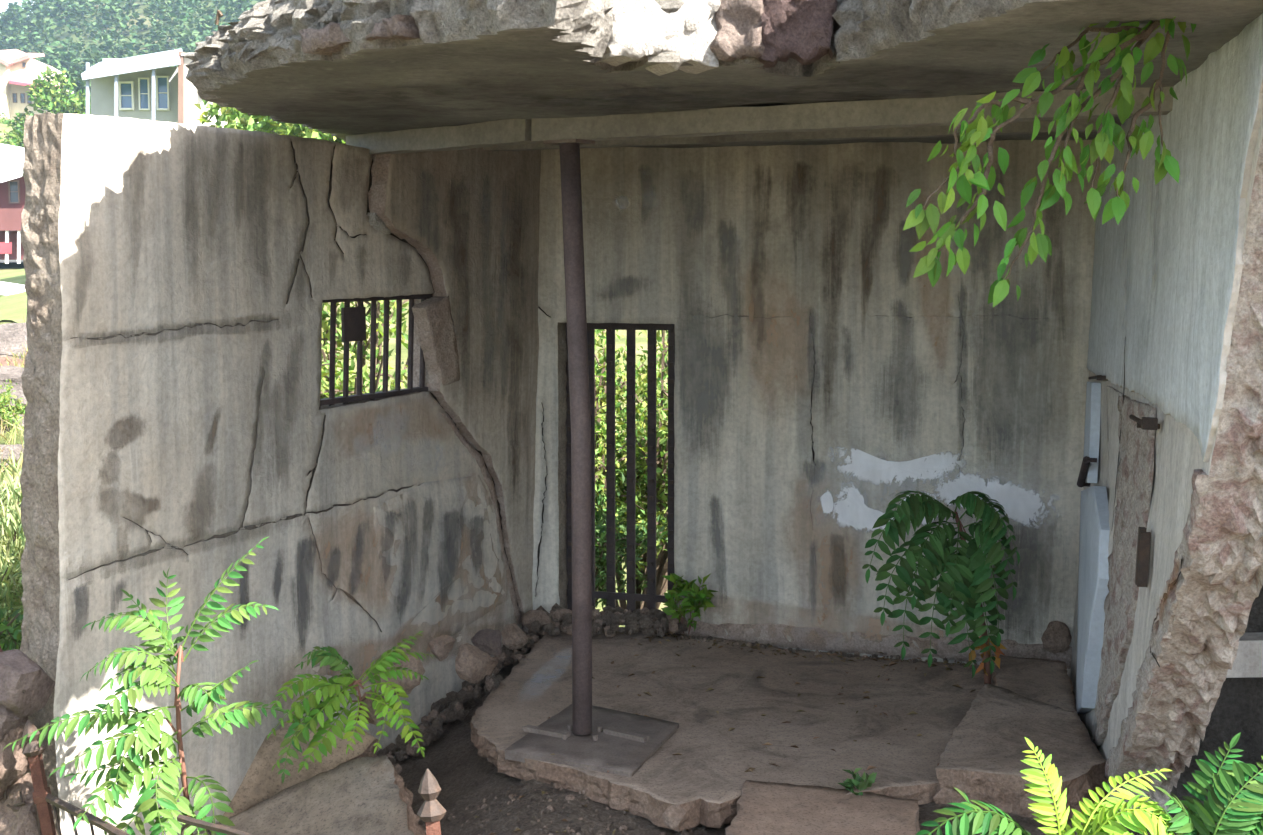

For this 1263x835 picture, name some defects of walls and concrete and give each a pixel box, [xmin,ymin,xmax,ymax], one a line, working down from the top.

spalling [299,14,420,56]
spalling [595,0,838,76]
crack [286,141,435,304]
water stain [958,162,1003,228]
water stain [74,586,89,635]
crack [123,517,188,555]
water stain [240,563,249,629]
water stain [274,538,316,646]
crack [304,415,382,632]
water stain [384,501,484,618]
crack [430,392,548,625]
spalling [1093,395,1209,786]